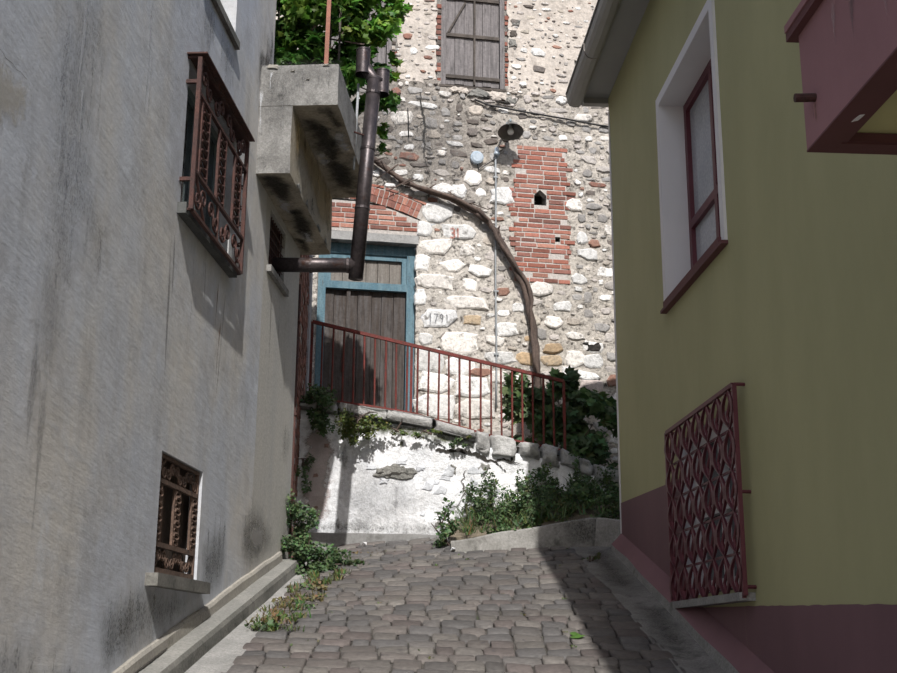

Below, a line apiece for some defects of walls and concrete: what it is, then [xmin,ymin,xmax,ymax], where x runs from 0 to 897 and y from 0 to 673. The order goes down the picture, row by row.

water stain [262,176,311,251]
spalling [366,460,424,484]
peeling [422,464,457,527]
crack [432,442,521,515]
peeling [465,463,501,499]